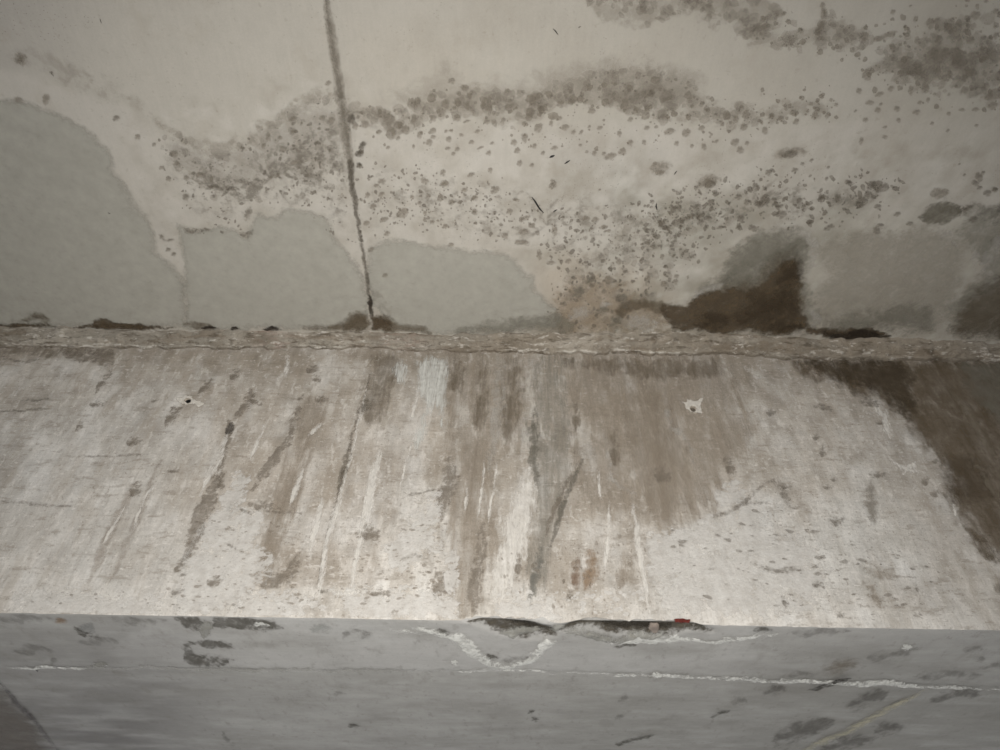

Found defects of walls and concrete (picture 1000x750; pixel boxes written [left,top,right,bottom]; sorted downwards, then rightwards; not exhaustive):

water stain [0,95,573,334]
crack [325,0,373,319]
water stain [920,191,976,223]
water stain [606,243,889,339]
water stain [174,389,258,572]
water stain [351,452,382,587]
water stain [400,358,456,487]
water stain [437,449,497,528]
peeling [328,467,832,644]
water stain [632,510,650,613]
water stain [798,359,1000,557]
crack [809,678,851,691]